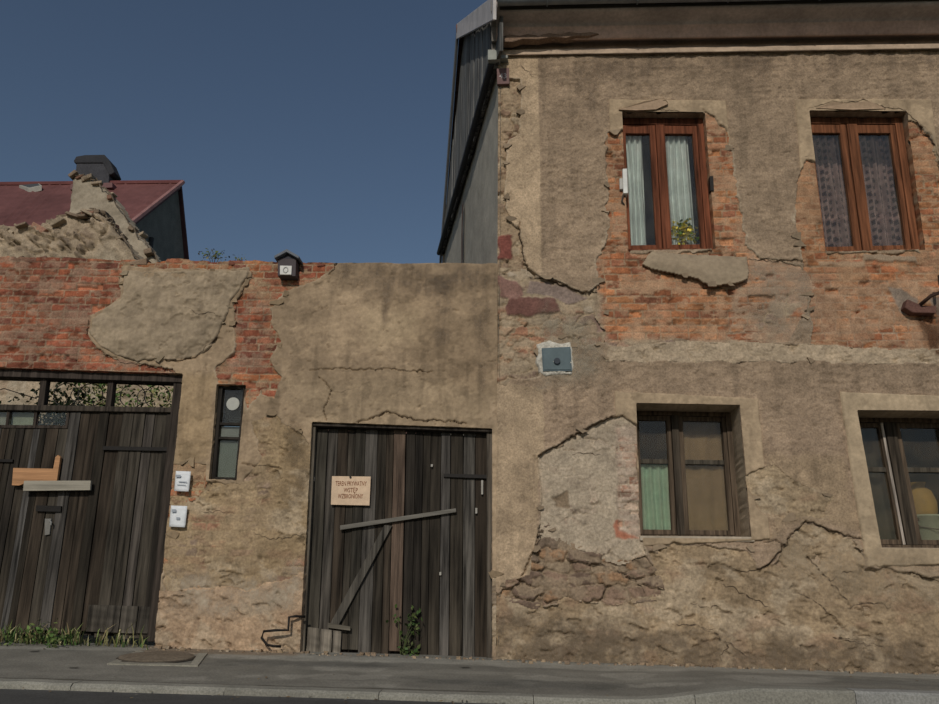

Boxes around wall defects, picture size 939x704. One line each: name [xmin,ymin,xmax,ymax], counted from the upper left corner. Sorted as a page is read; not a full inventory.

spalling [497,80,939,386]
spalling [0,170,336,597]
crack [358,411,465,424]
crack [570,561,647,596]
spalling [488,416,939,674]
crack [672,521,863,661]
crack [801,555,891,647]